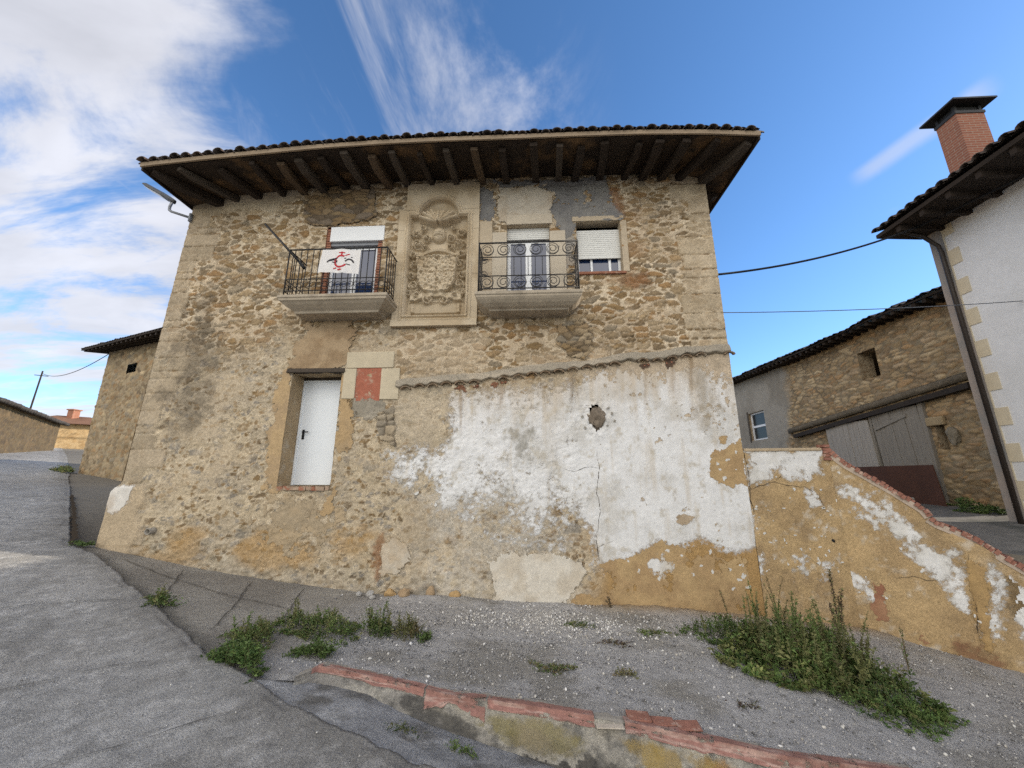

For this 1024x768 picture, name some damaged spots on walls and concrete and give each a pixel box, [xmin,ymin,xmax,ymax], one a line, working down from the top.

peeling [106,484,135,515]
crack [565,460,610,558]
peeling [384,358,1024,640]
crack [744,454,823,510]